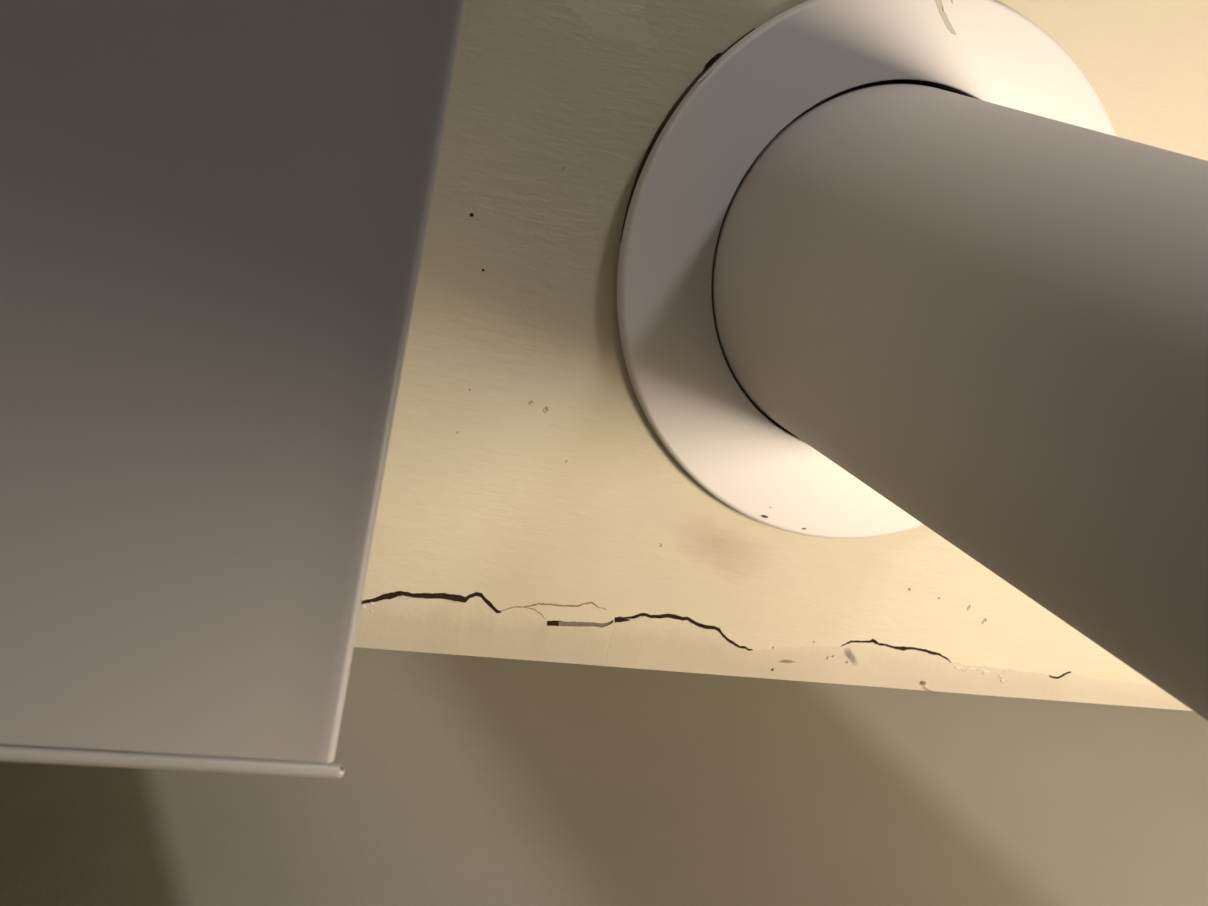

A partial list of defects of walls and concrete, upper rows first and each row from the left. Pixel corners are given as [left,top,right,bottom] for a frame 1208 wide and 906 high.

crack [361,591,752,650]
crack [842,639,950,662]